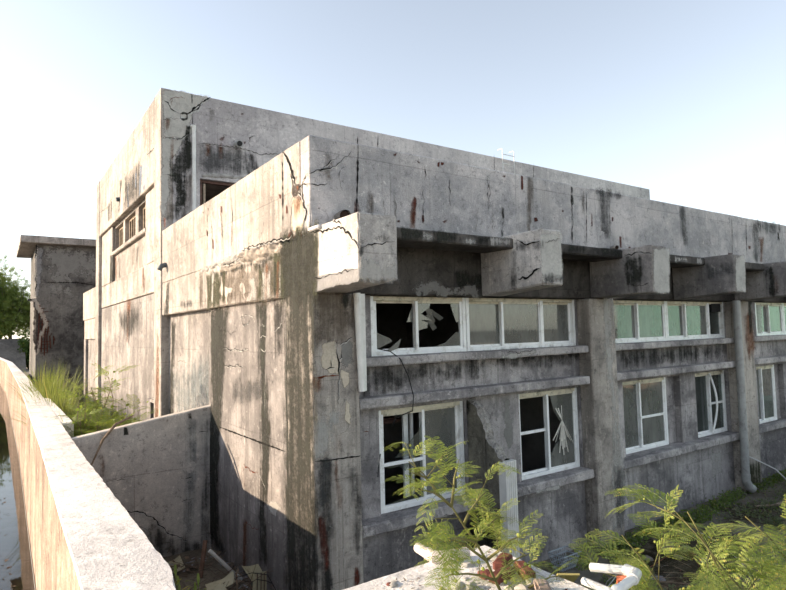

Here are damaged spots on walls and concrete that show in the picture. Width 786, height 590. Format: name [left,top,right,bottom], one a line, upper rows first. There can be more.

leakage [108,168,139,218]
leakage [167,126,258,219]
crack [146,97,386,267]
peeling [291,179,303,232]
crack [517,267,542,281]
leakage [653,249,670,293]
peeling [321,342,349,388]
leakage [363,360,483,396]
leakage [181,222,349,590]
peeling [503,400,513,448]
crack [127,511,186,542]
leakage [150,529,199,556]